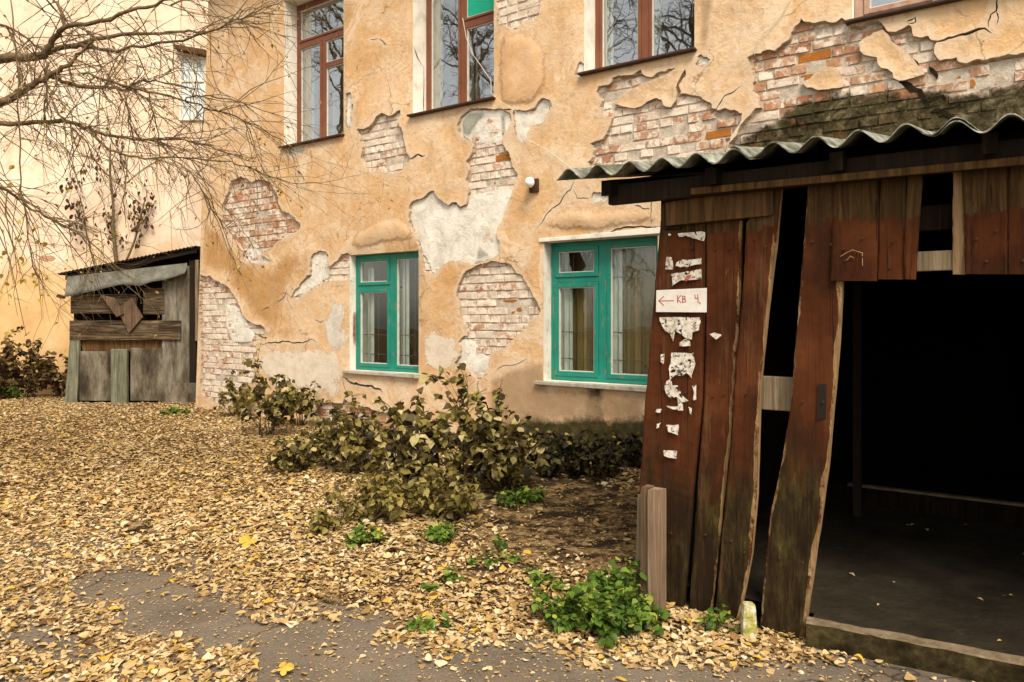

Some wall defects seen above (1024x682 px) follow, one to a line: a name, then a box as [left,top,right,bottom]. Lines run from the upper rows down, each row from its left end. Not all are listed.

flaking render [495,0,540,30]
crack [938,0,999,42]
flaking render [345,92,410,174]
flaking render [587,18,1024,167]
damp [739,85,1024,147]
flaking render [222,176,300,264]
flaking render [408,98,552,381]
crack [538,182,590,227]
flaking render [290,250,351,300]
crack [262,291,322,345]
flaking render [199,274,415,431]
crack [342,376,383,396]